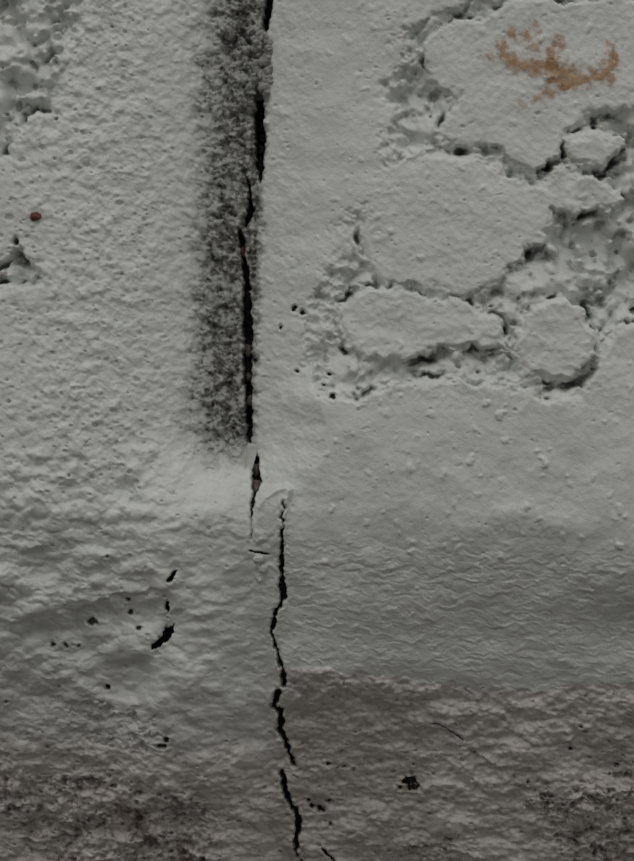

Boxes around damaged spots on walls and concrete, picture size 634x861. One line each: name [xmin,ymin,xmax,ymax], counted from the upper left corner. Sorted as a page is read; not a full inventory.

spalling [0,0,77,157]
crack [264,0,273,32]
rust [487,20,618,98]
spalling [0,239,41,286]
spalling [292,0,634,401]
crack [238,98,303,861]